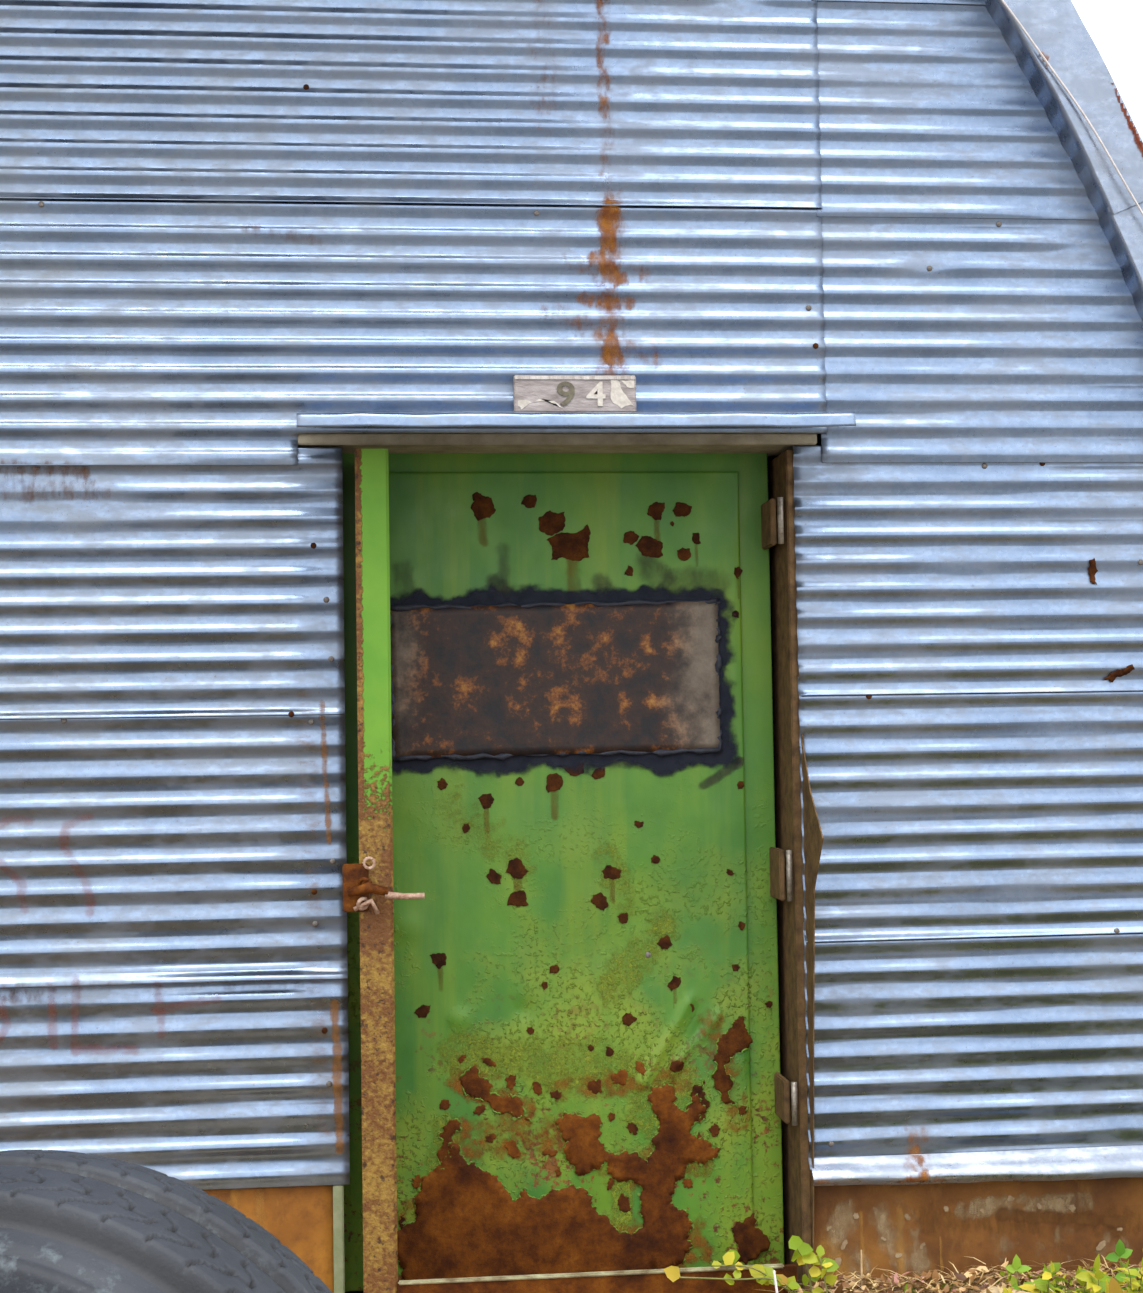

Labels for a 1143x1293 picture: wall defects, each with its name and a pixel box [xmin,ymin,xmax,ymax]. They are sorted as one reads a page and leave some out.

rust [580,198,634,375]
rust [471,492,496,521]
rust [521,495,591,572]
rust [1088,558,1098,585]
rust [1104,664,1135,682]
rust [546,765,605,793]
rust [478,793,494,830]
rust [486,858,528,907]
rust [591,865,628,924]
rust [430,953,447,969]
rust [397,1015,753,1280]
rust [731,1213,770,1265]